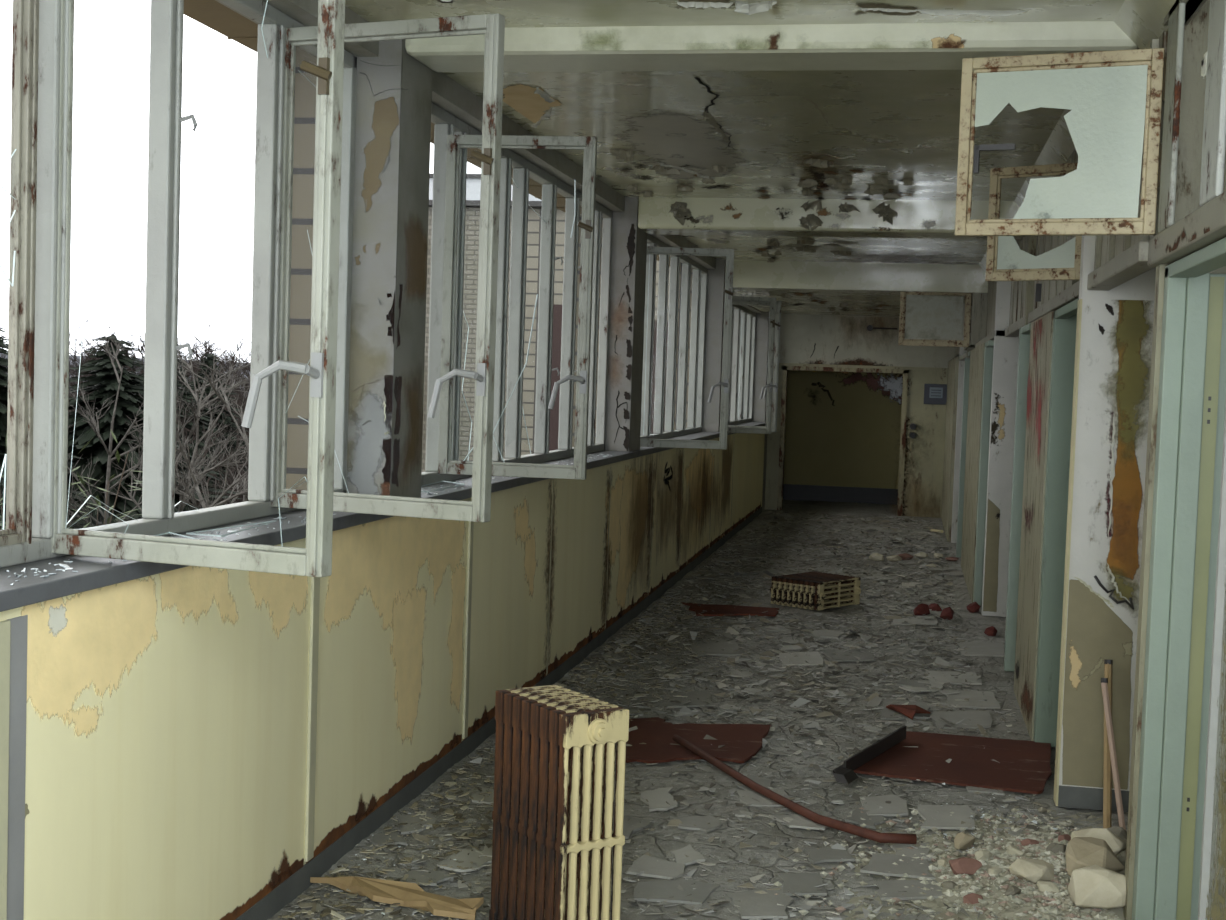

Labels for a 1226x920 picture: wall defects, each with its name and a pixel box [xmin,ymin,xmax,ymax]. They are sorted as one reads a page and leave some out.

peeling [675,0,777,15]
peeling [361,97,400,212]
peeling [503,84,563,128]
crack [594,77,764,153]
leakage [802,157,829,190]
leakage [630,443,732,569]
peeling [1062,300,1152,790]
peeling [21,566,238,737]
peeling [249,571,308,638]
peeling [324,516,466,743]
corrosion [220,706,495,920]